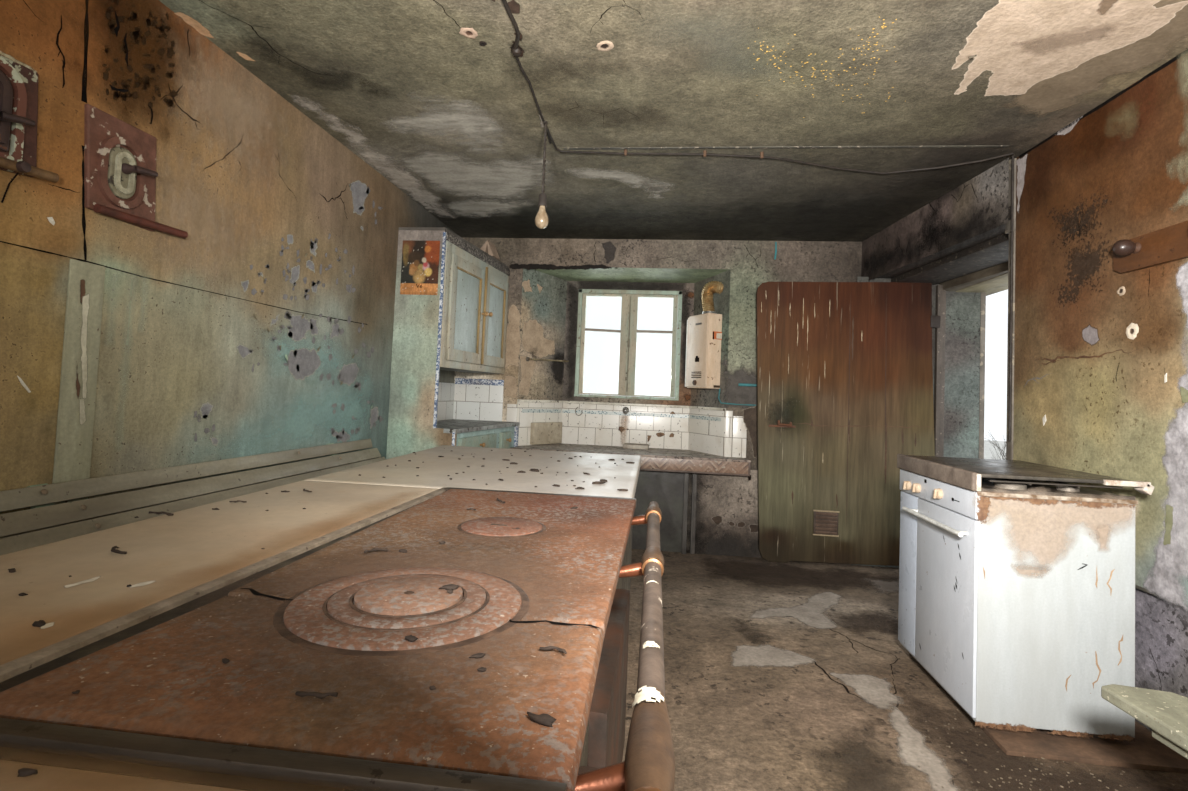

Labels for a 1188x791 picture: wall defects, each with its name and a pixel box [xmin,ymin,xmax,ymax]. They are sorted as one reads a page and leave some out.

crack [23,0,66,88]
leakage [100,0,178,124]
flaking render [952,0,1188,135]
crack [275,148,348,218]
leakage [296,97,547,218]
flaking render [1016,154,1028,213]
peeling [241,233,384,442]
flaking render [509,241,619,292]
leakage [1048,193,1113,308]
leakage [1176,262,1188,327]
leakage [1144,374,1188,611]
peeling [731,645,815,667]